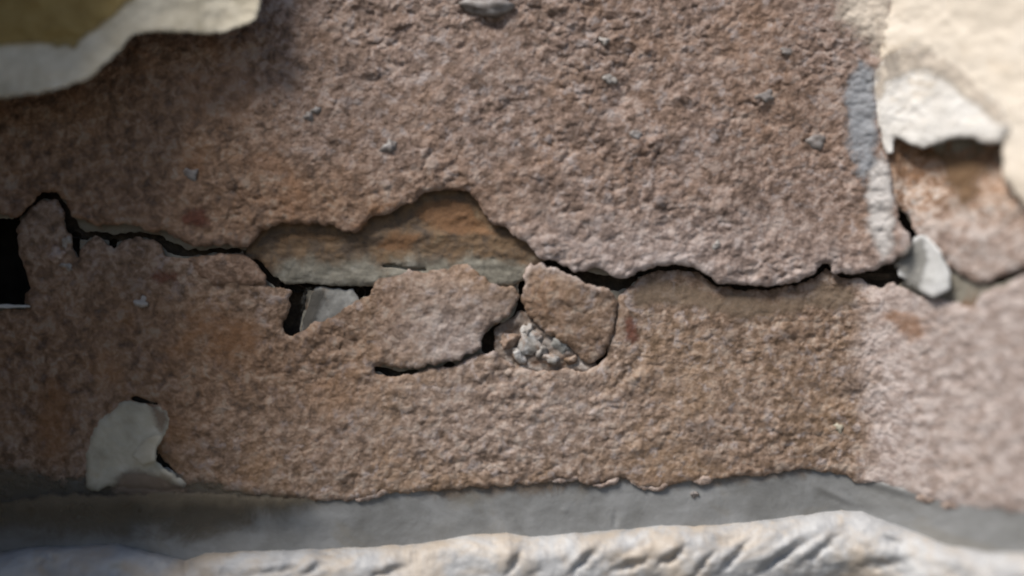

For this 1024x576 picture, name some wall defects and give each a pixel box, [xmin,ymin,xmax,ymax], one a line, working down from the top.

peeling [0,0,261,98]
spalling [874,0,1024,298]
crack [14,192,373,336]
spalling [245,190,546,332]
crack [544,211,917,291]
crack [375,362,455,377]
crack [481,281,525,354]
spalling [494,310,597,372]
crack [595,349,607,366]
peeling [85,400,187,500]